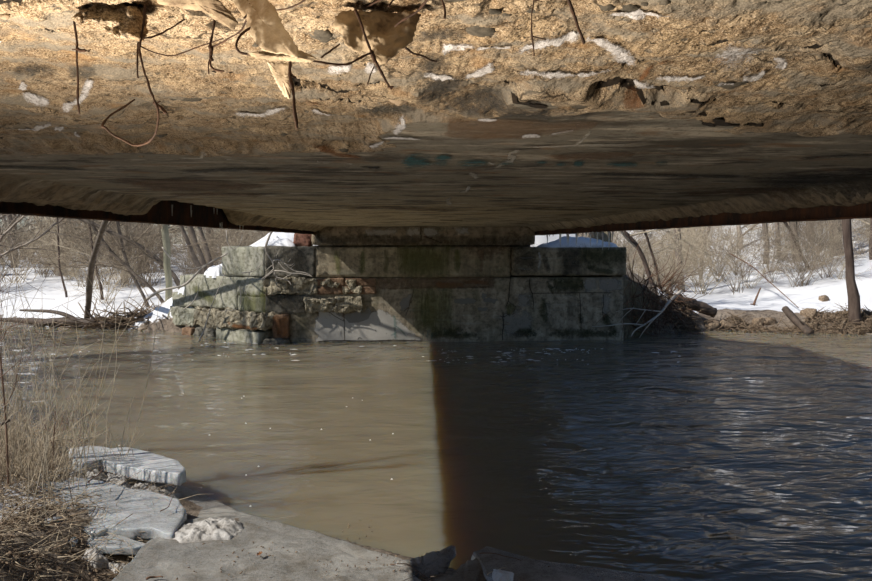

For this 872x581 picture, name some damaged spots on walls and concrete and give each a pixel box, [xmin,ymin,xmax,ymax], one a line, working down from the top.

leakage [14,65,53,106]
leakage [62,66,93,112]
spalling [0,0,872,158]
leakage [419,28,634,122]
leakage [363,106,420,148]